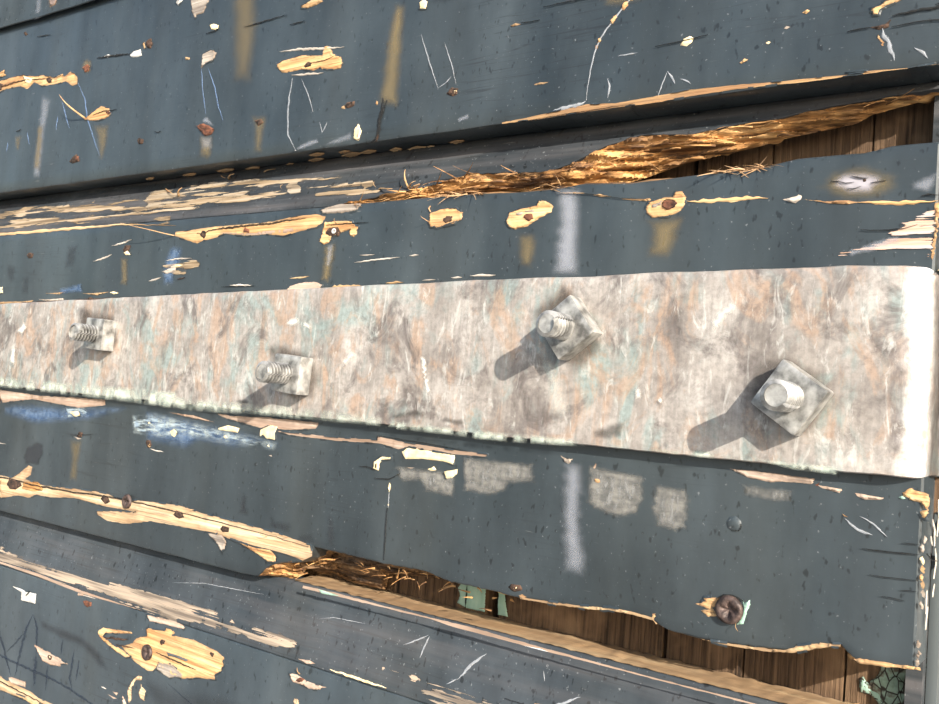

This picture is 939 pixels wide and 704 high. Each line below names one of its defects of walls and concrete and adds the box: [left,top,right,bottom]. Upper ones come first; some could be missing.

crack [361,97,387,144]
spalling [0,0,939,281]
crack [558,192,651,201]
crack [688,176,938,205]
peeling [0,285,117,304]
peeling [287,276,360,290]
peeling [0,389,105,418]
peeling [170,412,489,480]
peeling [899,488,939,630]
spalling [0,465,853,704]
peeling [854,640,927,704]